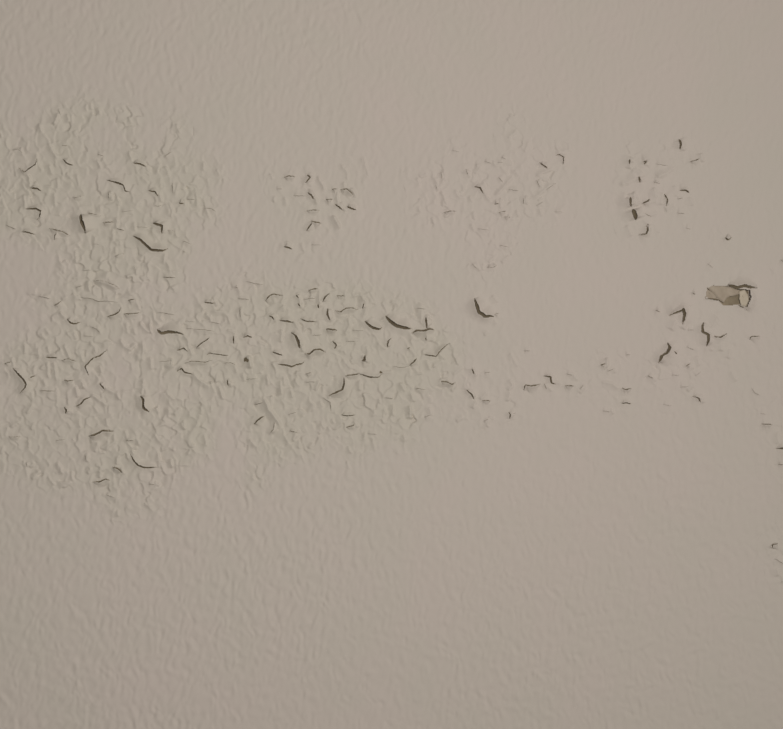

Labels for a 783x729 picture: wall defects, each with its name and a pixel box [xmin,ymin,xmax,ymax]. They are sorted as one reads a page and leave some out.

peeling [0,87,510,532]
peeling [638,265,783,526]